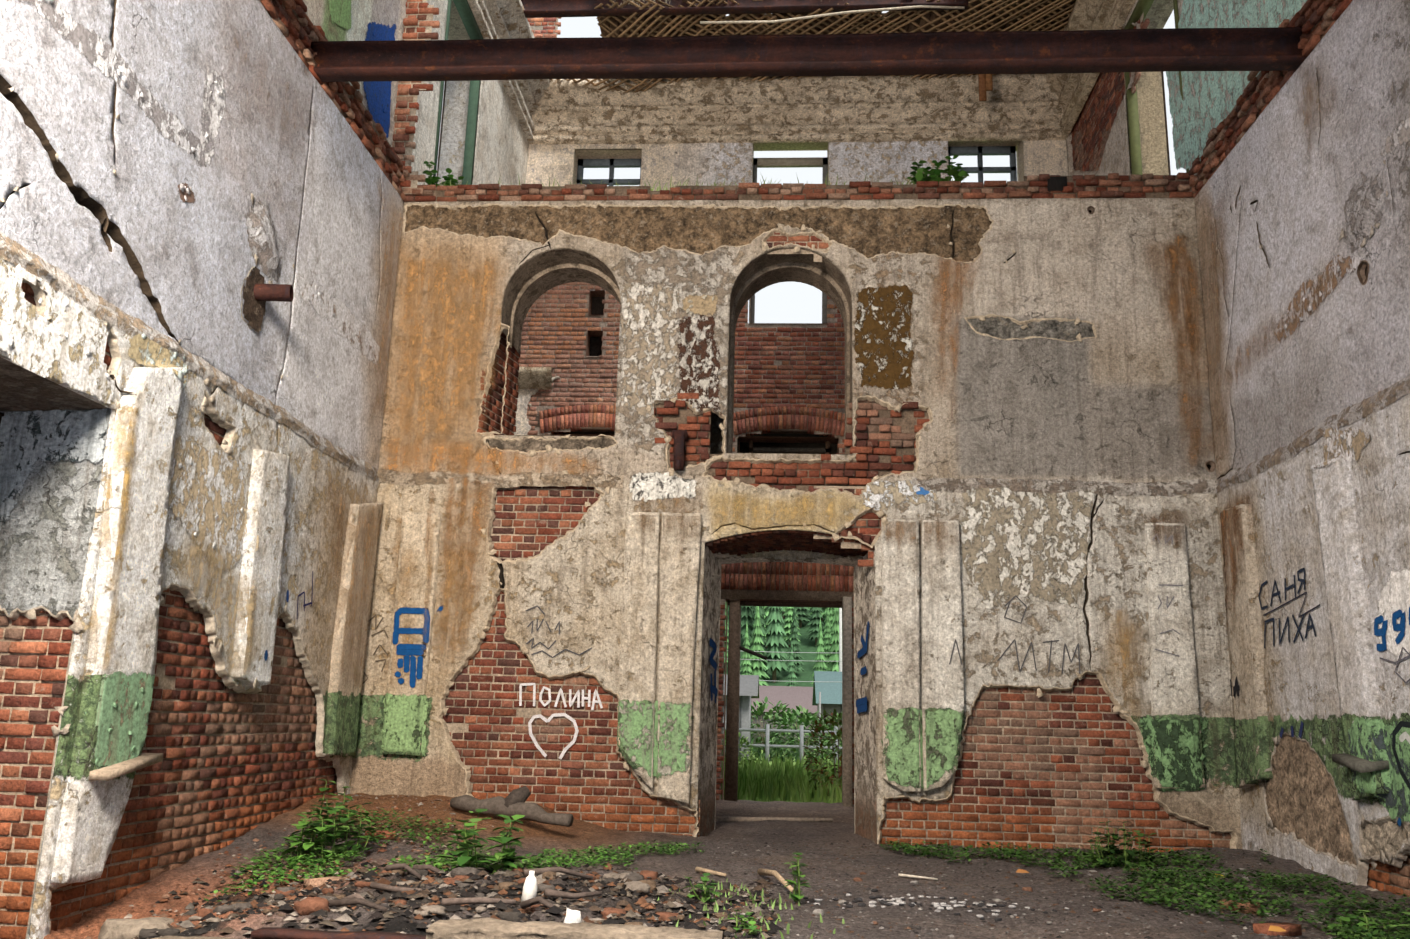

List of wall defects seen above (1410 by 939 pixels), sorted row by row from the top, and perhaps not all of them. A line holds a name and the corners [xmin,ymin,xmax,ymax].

crack [110,0,118,47]
crack [0,75,181,345]
flaking render [476,322,618,564]
flaking render [620,282,938,567]
peeling [961,487,1094,609]
crack [1083,494,1104,669]
flaking render [0,583,347,939]
flaking render [381,587,701,837]
flaking render [877,671,1238,853]
flaking render [1256,717,1410,897]